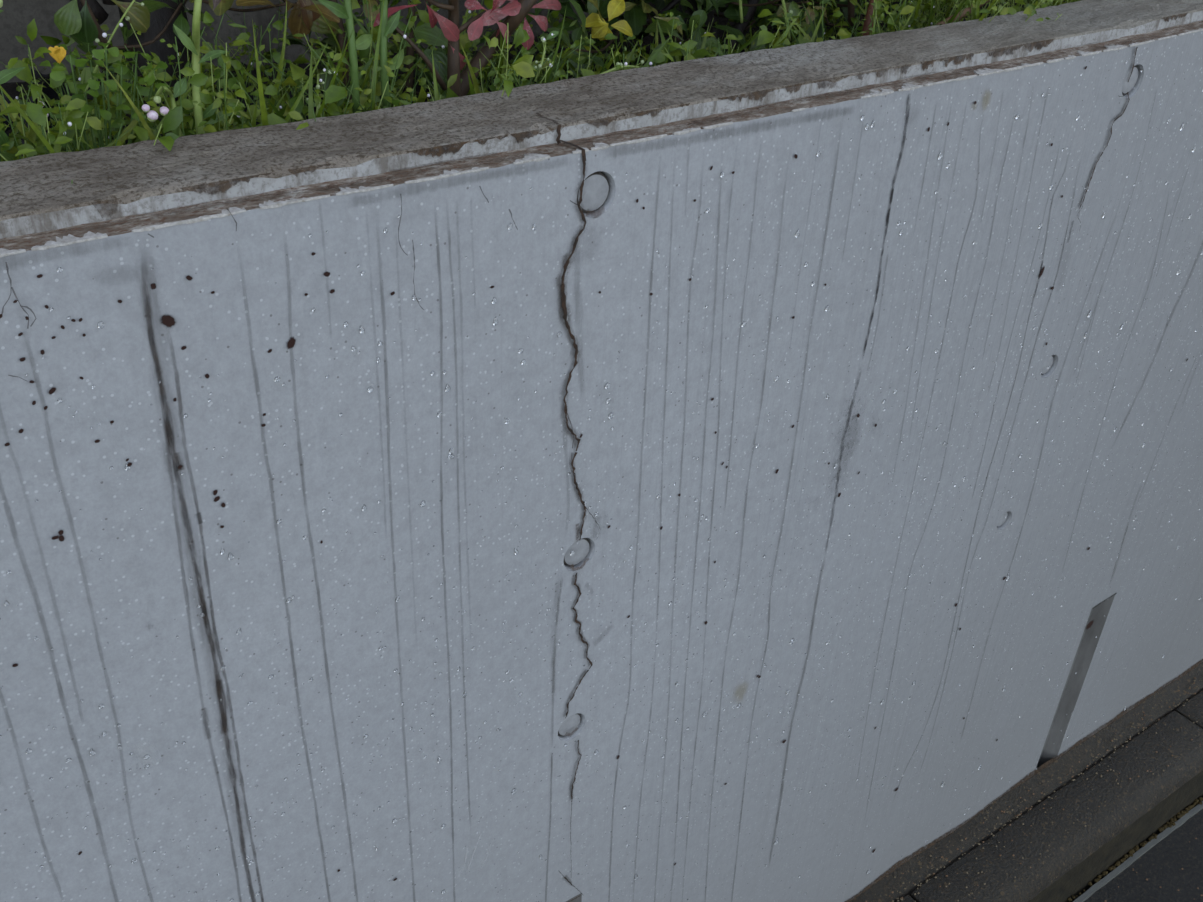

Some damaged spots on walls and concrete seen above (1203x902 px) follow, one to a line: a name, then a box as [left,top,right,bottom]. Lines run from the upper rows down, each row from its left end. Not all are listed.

damp [146,300,164,397]
crack [536,112,601,540]
damp [166,413,181,473]
damp [195,566,215,656]
damp [215,671,229,750]
crack [559,573,593,895]
damp [233,768,264,902]